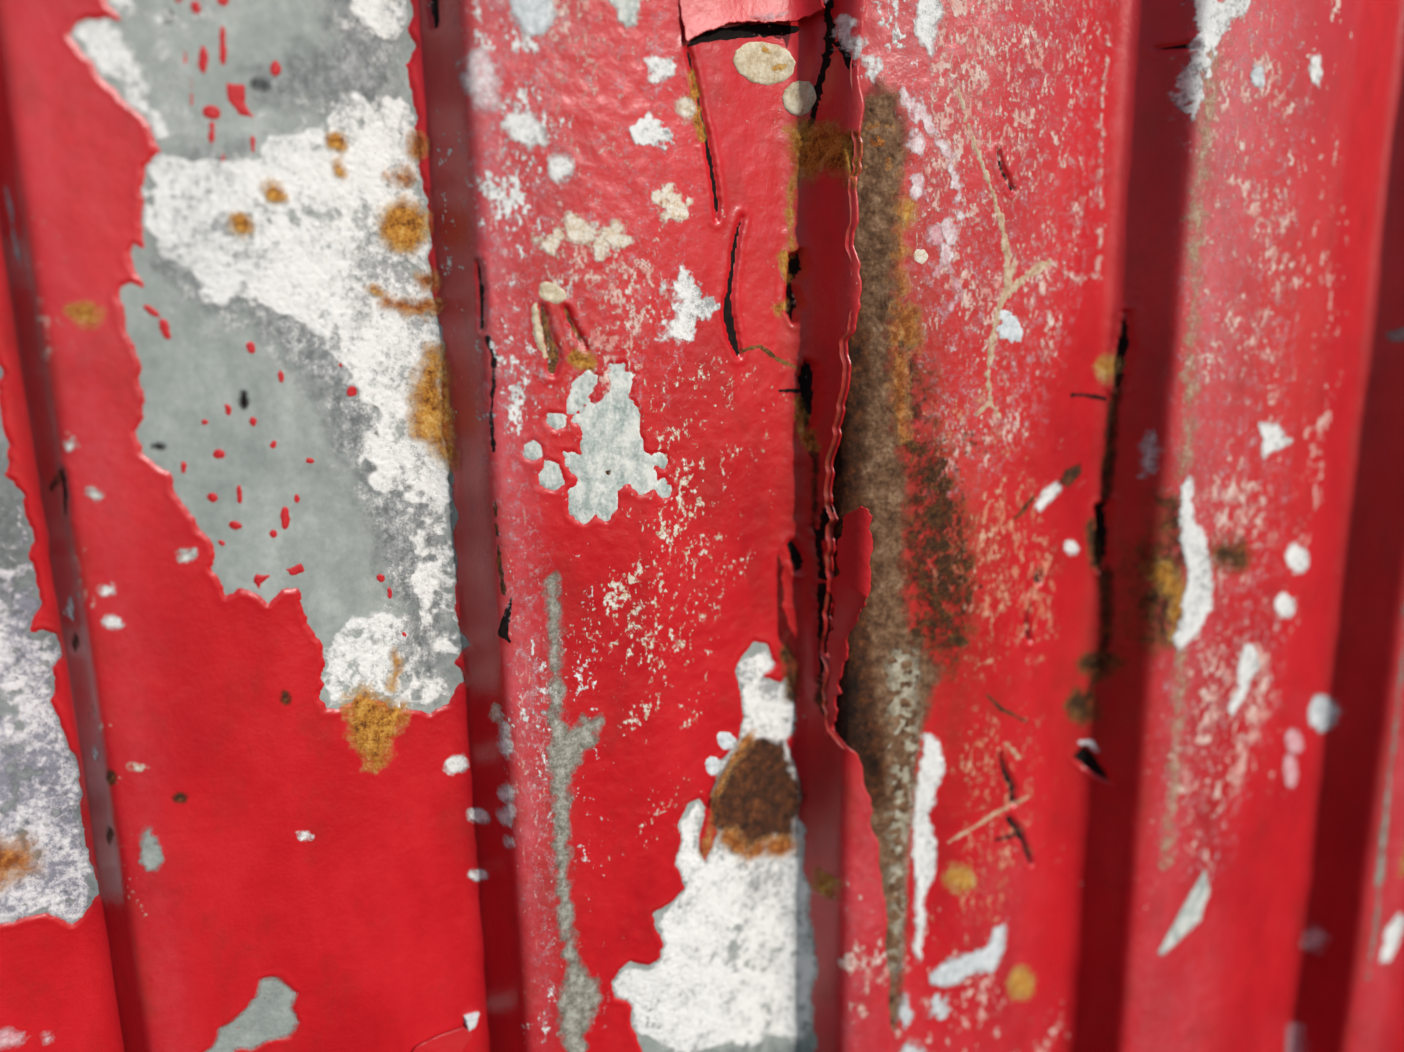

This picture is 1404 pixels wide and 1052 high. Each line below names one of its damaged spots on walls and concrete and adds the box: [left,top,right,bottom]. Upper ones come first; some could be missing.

peeling [0,409,124,924]
peeling [71,0,470,714]
rust [371,272,439,316]
rust [410,343,452,464]
peeling [612,642,862,1052]
crack [687,51,799,370]
rust [701,732,805,860]
peeling [437,0,1103,847]
crack [787,435,834,716]
crack [808,0,853,127]
rust [775,80,984,1031]
crack [1070,318,1130,508]